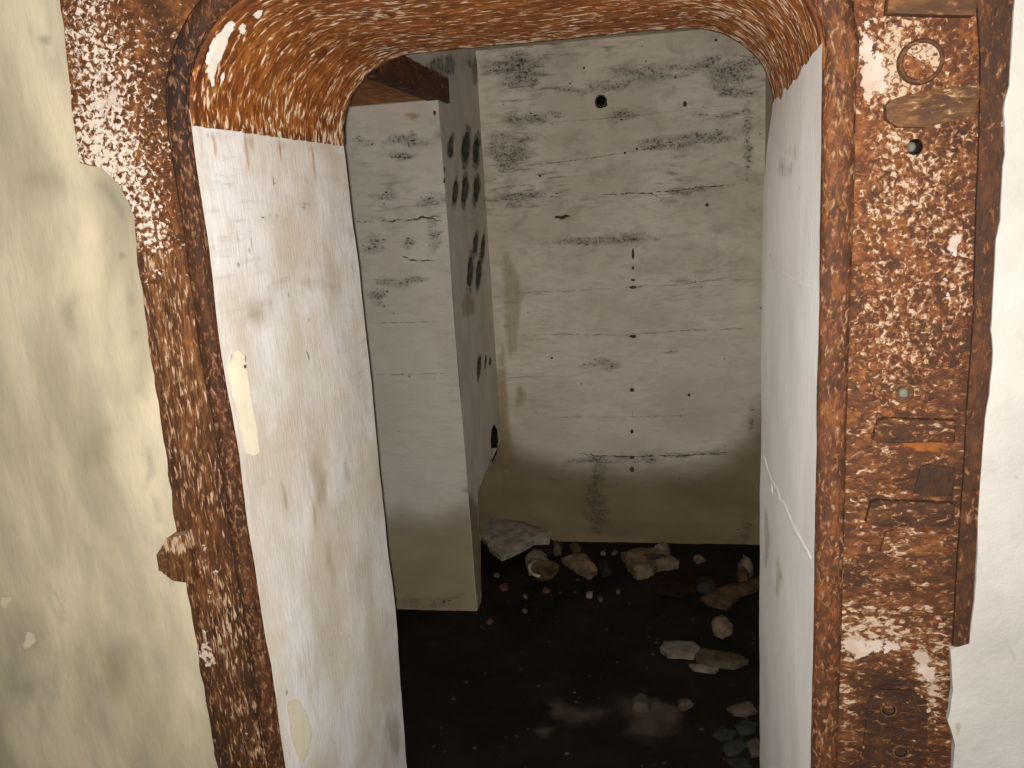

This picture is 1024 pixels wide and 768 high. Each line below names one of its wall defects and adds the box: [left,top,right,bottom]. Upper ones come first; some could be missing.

peeling [205,10,263,87]
damp [468,54,537,85]
mould [589,56,759,95]
peeling [228,350,260,456]
rust [903,442,948,452]
damp [386,381,768,611]
peeling [288,700,311,760]